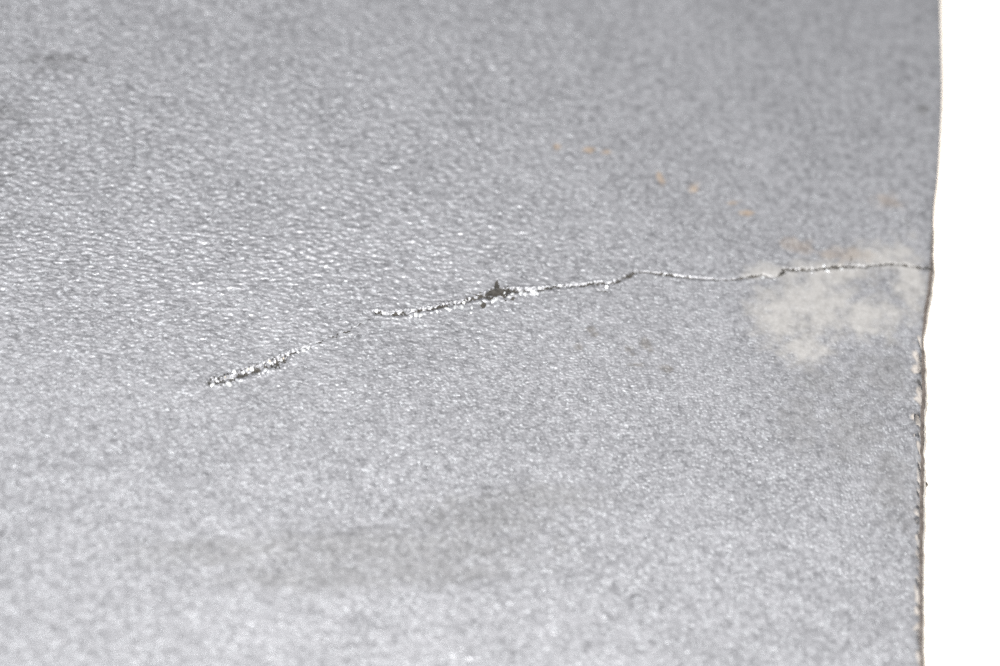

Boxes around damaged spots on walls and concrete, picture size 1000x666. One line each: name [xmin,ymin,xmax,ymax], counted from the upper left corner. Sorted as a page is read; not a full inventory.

crack [207,255,932,387]